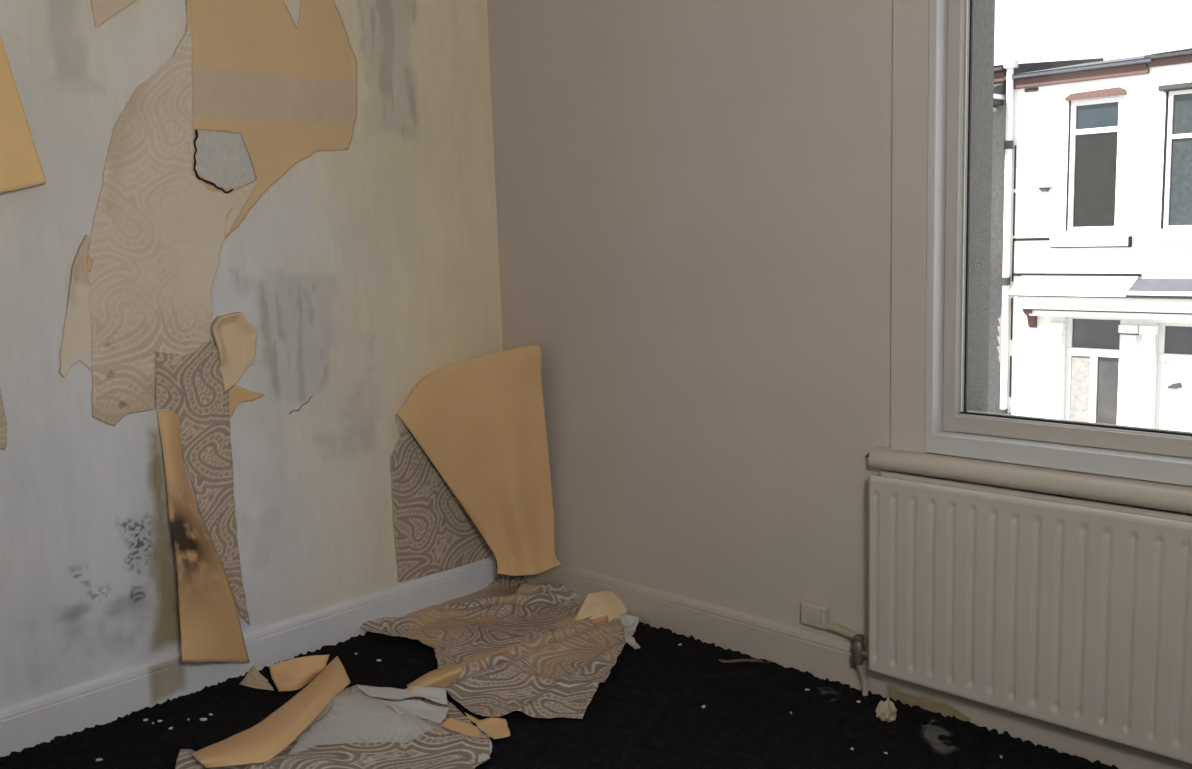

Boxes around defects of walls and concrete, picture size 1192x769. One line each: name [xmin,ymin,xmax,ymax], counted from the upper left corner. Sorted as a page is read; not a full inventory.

flaking render [195,130,256,190]
peeling [58,235,93,378]
peeling [210,312,265,418]
damp [153,454,181,642]